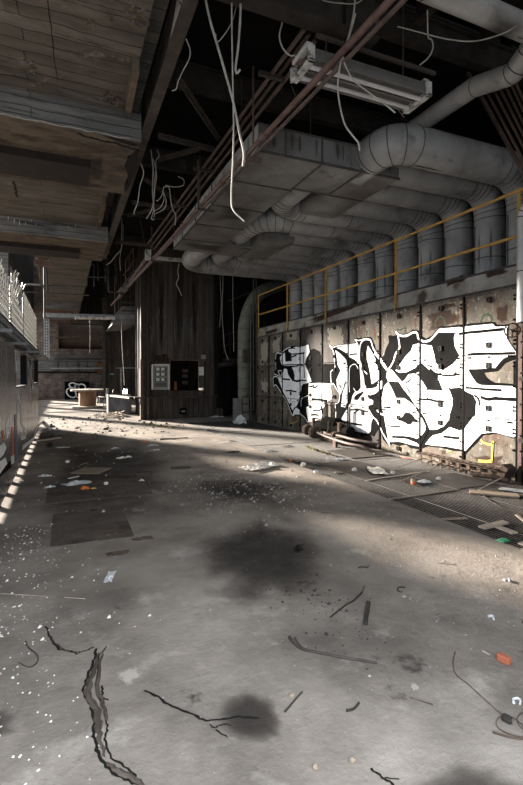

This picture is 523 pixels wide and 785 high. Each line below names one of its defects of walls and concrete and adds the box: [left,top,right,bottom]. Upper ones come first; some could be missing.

crack [0,0,138,107]
crack [45,626,144,785]
crack [144,690,259,737]
crack [370,768,399,785]